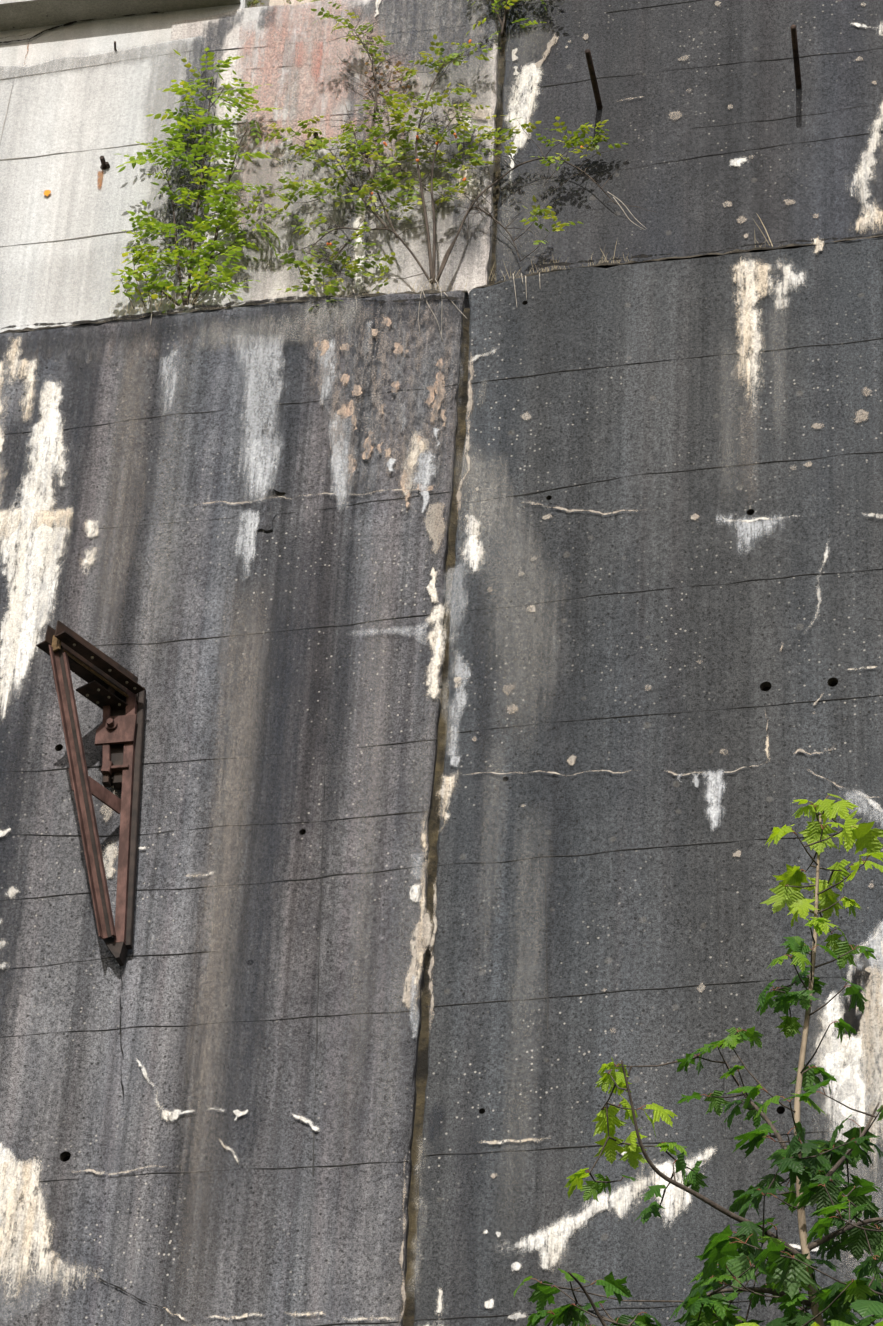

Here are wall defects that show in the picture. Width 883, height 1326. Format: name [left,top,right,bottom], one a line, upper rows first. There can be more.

damp [319,340,336,398]
efflorescence [733,260,804,396]
damp [236,318,303,567]
damp [0,337,98,718]
efflorescence [463,516,483,571]
efflorescence [724,517,776,547]
crack [669,722,882,827]
damp [0,741,32,1034]
efflorescence [815,928,883,1158]
spalling [843,949,875,1036]
crack [848,923,883,975]
damp [0,1143,84,1297]